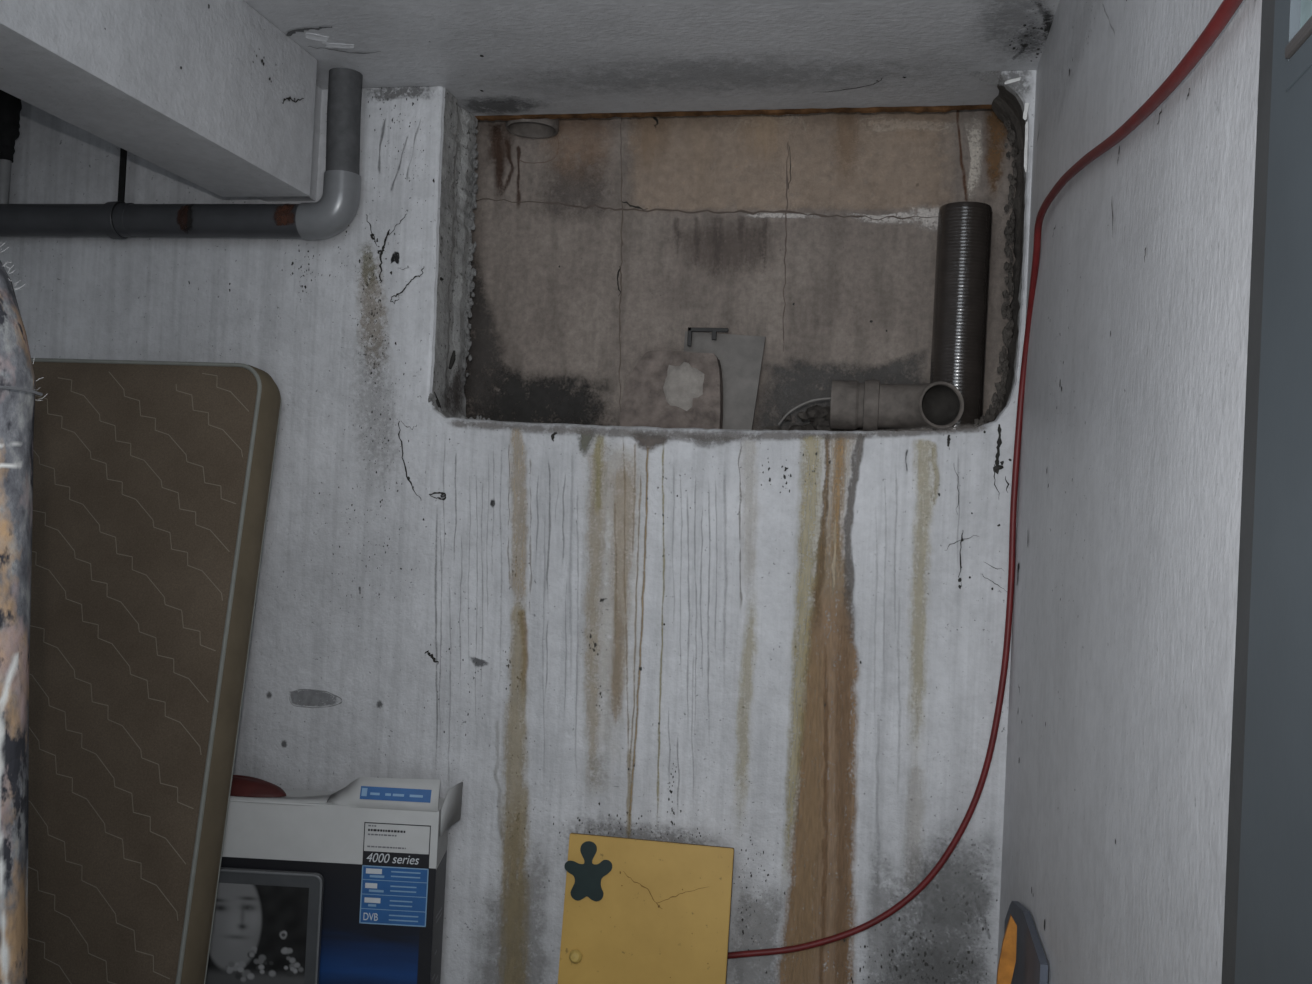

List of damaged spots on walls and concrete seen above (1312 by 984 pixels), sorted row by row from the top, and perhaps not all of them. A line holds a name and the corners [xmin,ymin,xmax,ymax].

water stain [975,5,1053,94]
water stain [277,214,409,476]
crack [366,214,424,304]
water stain [444,261,604,426]
crack [476,117,932,412]
corrosion [505,612,527,702]
corrosion [780,438,861,984]
water stain [834,847,998,984]